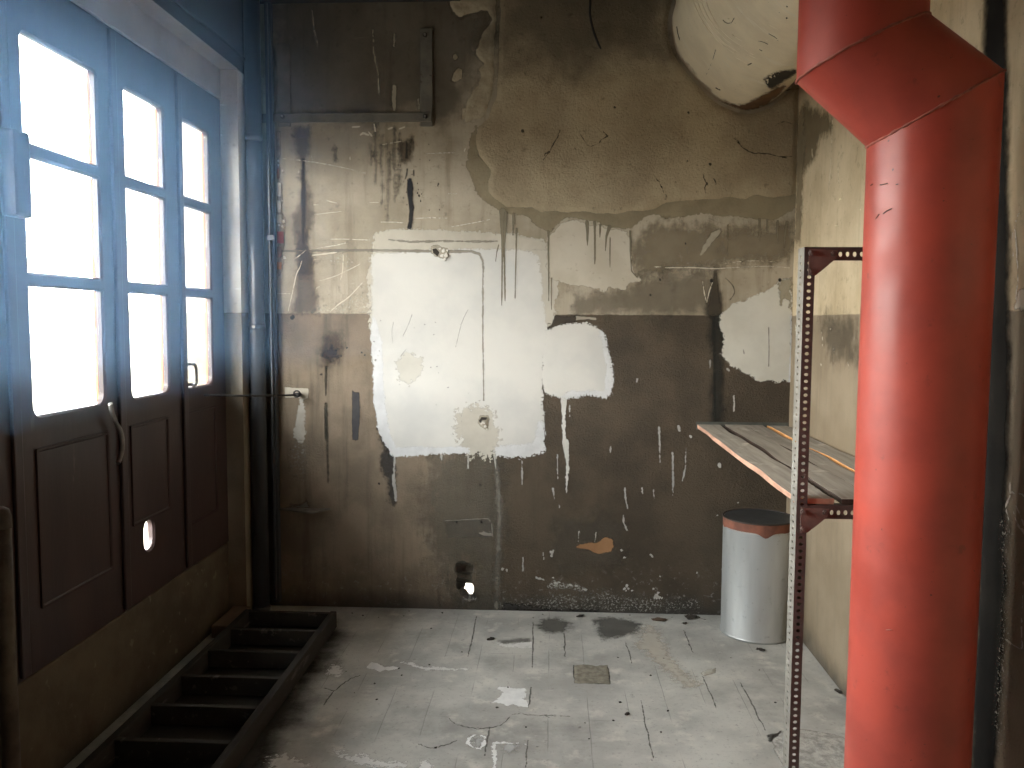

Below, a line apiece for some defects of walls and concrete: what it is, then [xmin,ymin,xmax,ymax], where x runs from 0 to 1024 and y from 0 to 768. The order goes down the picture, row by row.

crack [735,139,792,158]
flaking render [431,245,449,261]
damp [495,208,517,305]
damp [585,221,611,264]
flaking render [478,415,489,430]
damp [518,591,700,638]